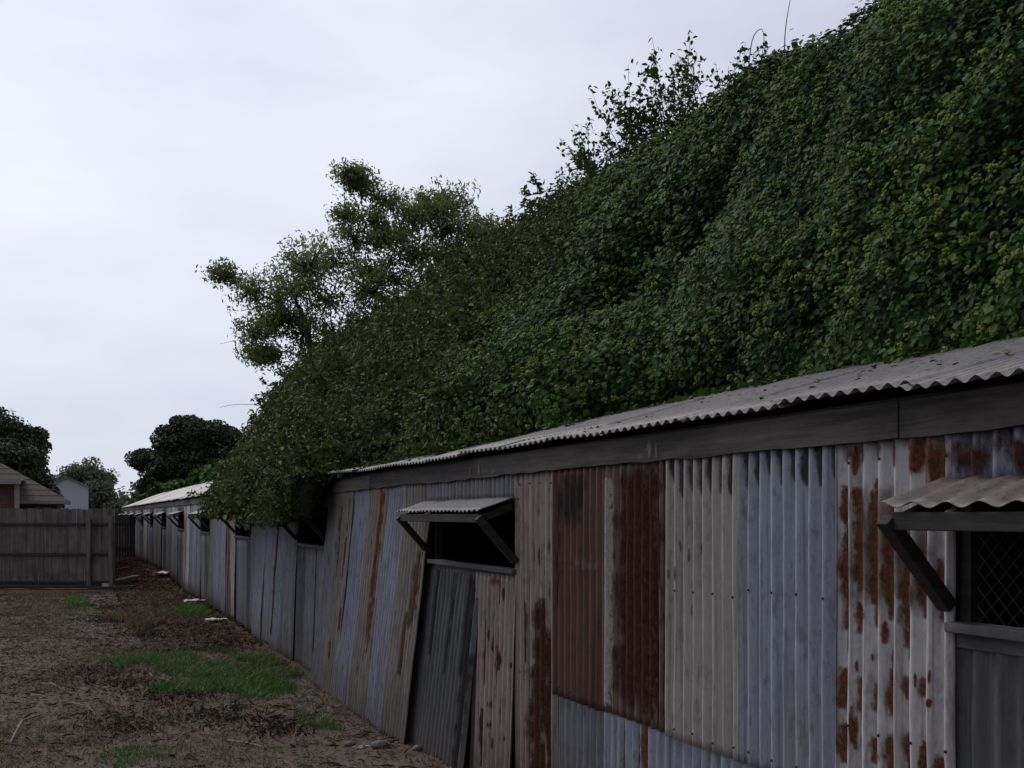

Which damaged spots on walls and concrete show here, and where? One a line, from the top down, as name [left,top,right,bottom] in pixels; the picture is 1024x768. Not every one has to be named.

corrosion [909,436,1024,484]
corrosion [356,490,385,676]
corrosion [478,702,505,767]
corrosion [483,581,551,768]
corrosion [611,466,675,768]
corrosion [836,445,944,768]